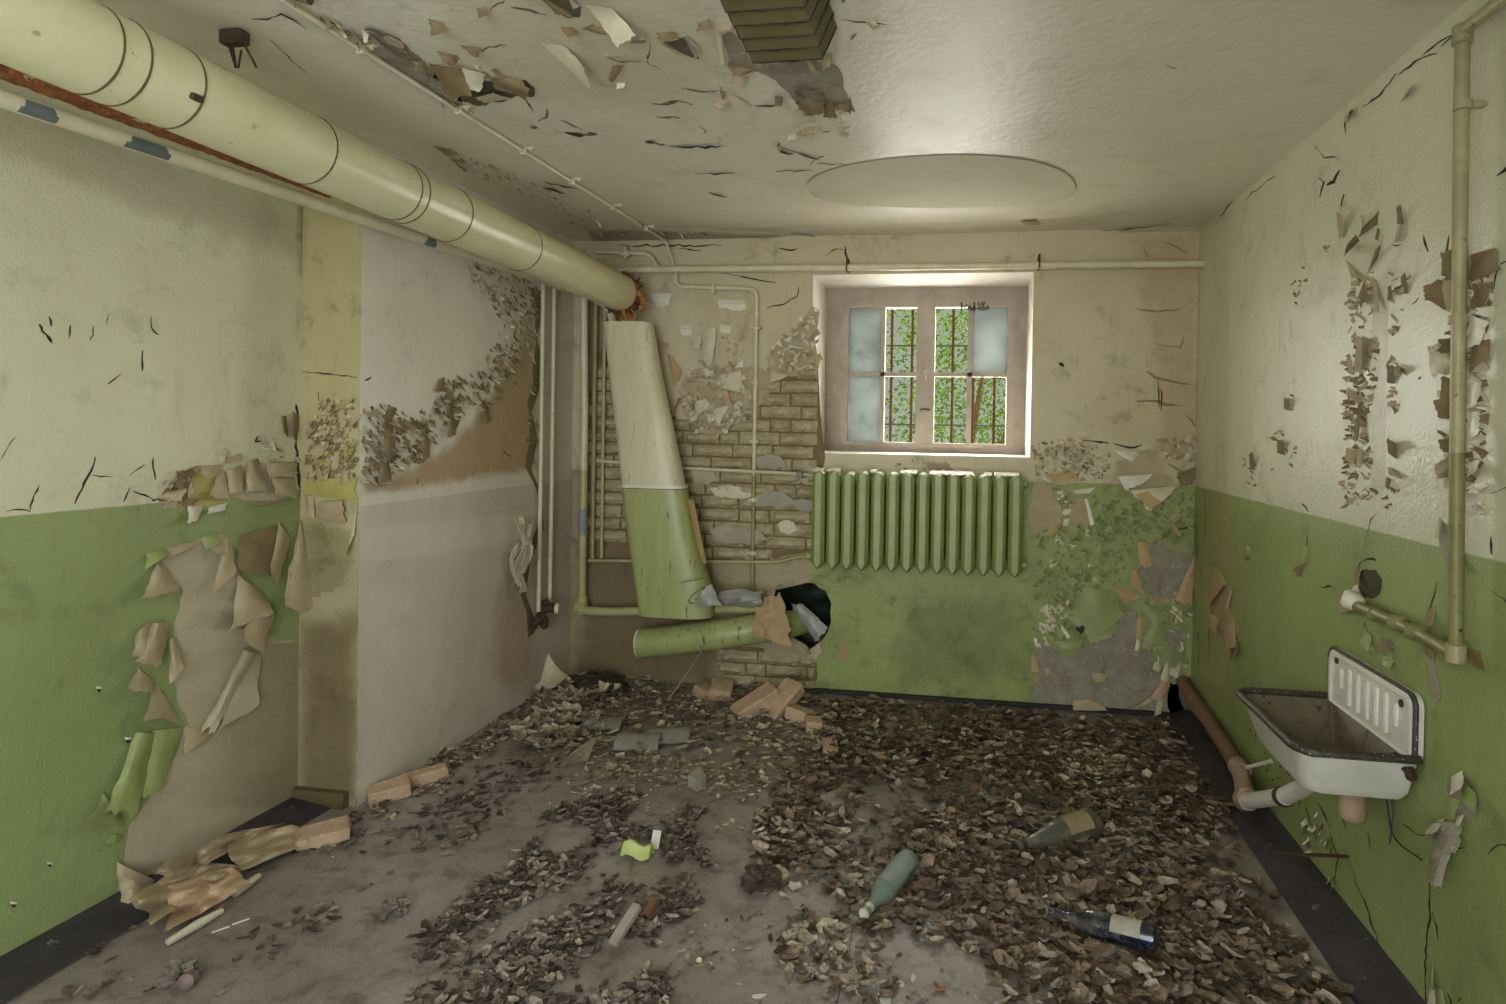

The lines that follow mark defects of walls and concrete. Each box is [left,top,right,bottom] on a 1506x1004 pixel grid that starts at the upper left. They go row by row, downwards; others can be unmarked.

peeling [286,0,549,129]
peeling [541,0,855,120]
peeling [89,262,546,903]
flaking render [587,350,629,548]
flaking render [658,287,840,689]
peeling [1028,433,1239,716]
peeling [1336,557,1382,613]
peeling [1322,204,1506,517]
peeling [1425,518,1448,626]
peeling [1327,622,1441,756]